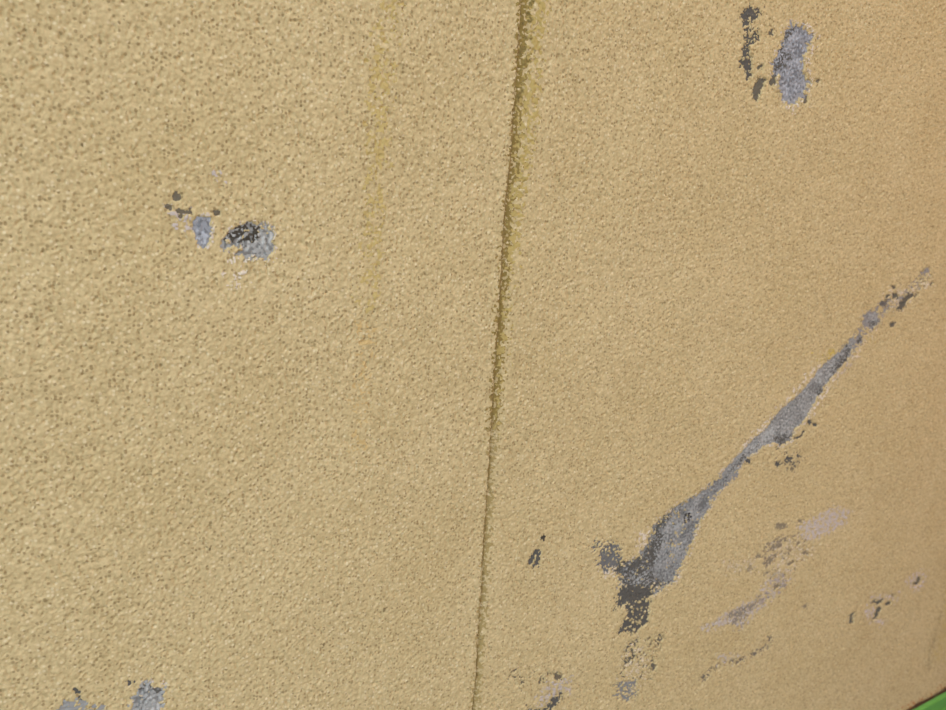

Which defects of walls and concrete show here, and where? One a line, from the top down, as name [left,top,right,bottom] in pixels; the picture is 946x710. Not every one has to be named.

peeling [738,3,821,105]
crack [499,0,521,301]
peeling [164,191,278,263]
peeling [884,285,917,327]
peeling [772,420,817,473]
crack [472,332,498,709]
peeling [589,539,626,576]
peeling [713,516,809,631]
peeling [57,687,107,710]
peeling [125,677,167,710]